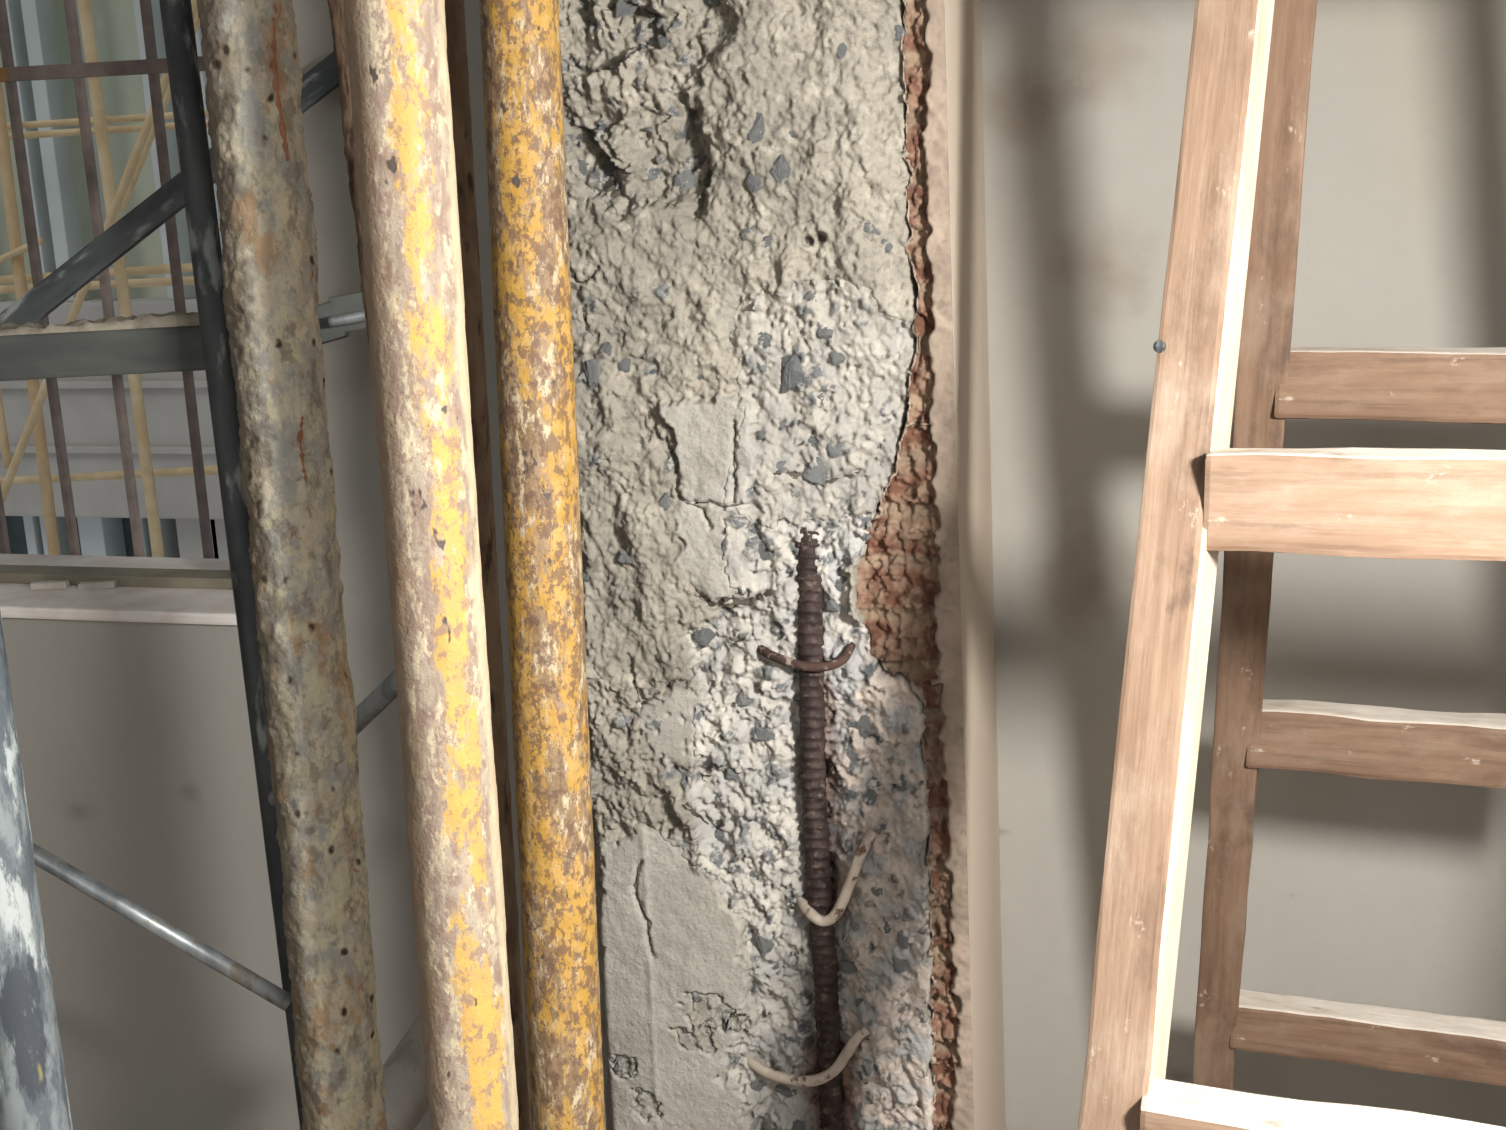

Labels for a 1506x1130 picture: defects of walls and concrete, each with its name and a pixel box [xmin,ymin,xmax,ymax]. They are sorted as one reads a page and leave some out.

crack [648,410,742,527]
crack [773,471,859,487]
spalling [583,0,961,1130]
crack [633,862,653,956]
corrosion [831,877,839,909]